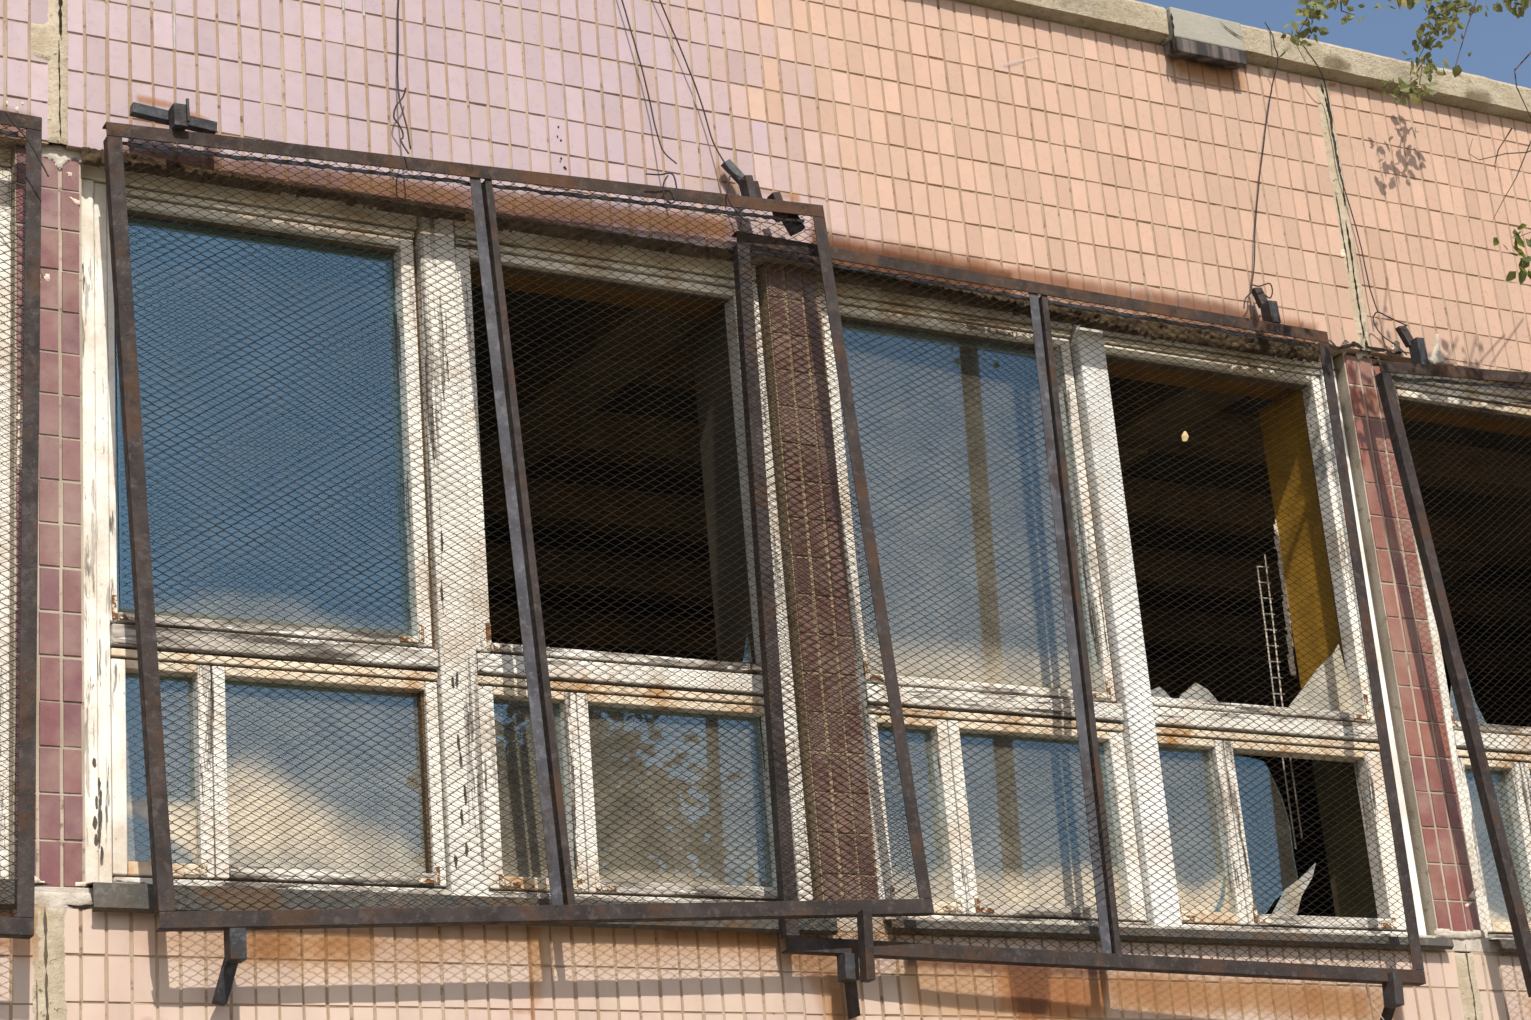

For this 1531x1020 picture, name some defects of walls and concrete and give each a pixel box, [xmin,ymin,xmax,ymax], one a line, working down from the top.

crack [56,0,64,136]
crack [1321,84,1402,355]
peeling [92,758,104,860]